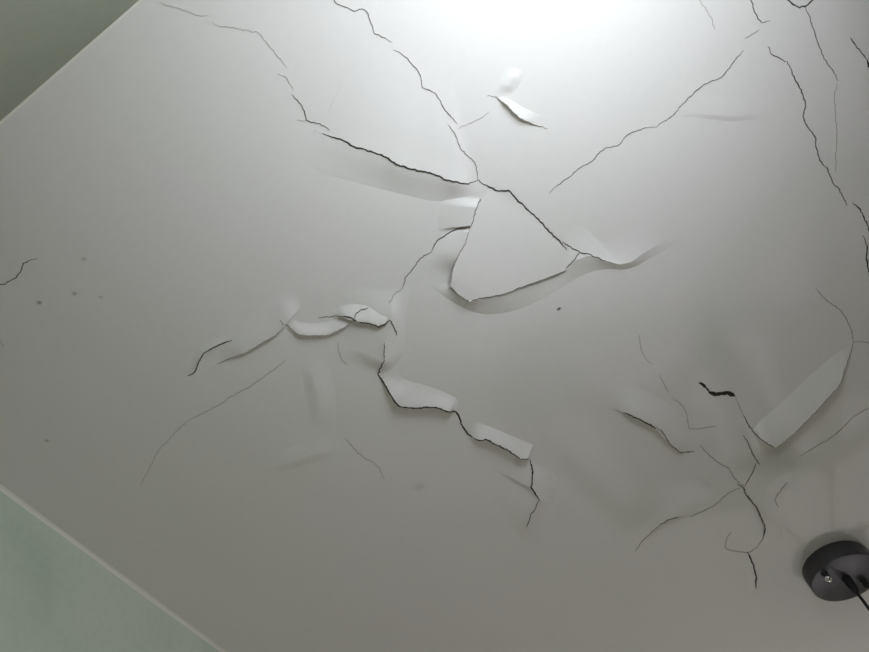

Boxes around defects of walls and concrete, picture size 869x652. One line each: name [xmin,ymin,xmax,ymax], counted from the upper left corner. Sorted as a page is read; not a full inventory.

crack [140,0,605,525]
crack [552,0,869,272]
crack [623,289,869,588]